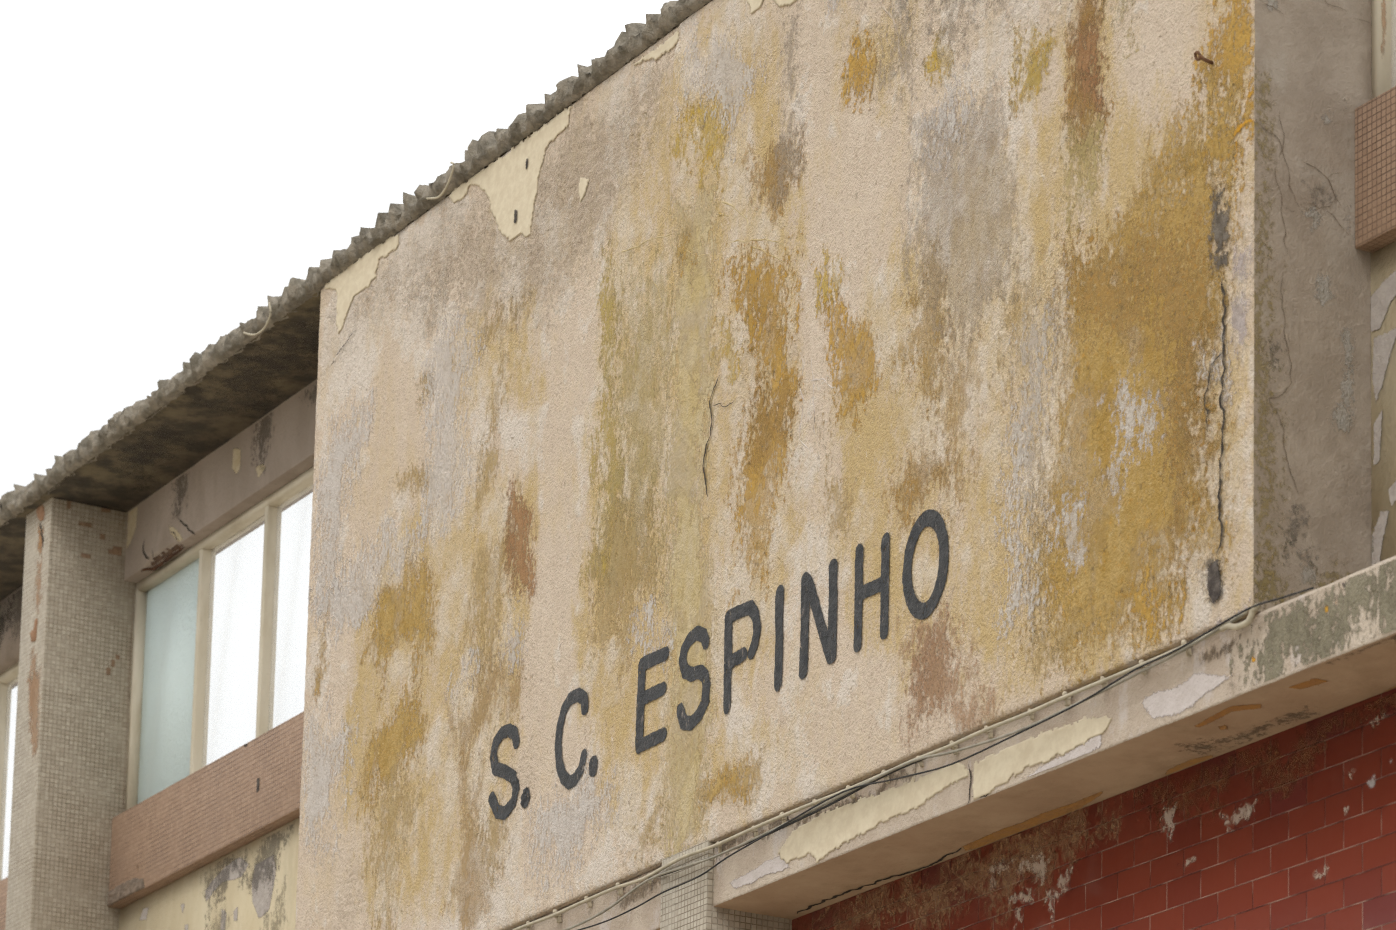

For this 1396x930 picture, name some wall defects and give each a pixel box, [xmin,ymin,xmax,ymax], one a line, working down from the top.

water stain [923,30,972,167]
spalling [0,0,711,756]
water stain [994,0,1255,695]
crack [1233,91,1348,494]
peeling [1371,271,1396,465]
water stain [579,53,977,906]
peeling [1372,481,1396,565]
peeling [205,854,276,930]
water stain [525,760,615,892]
water stain [819,808,1120,930]
peeling [1142,672,1229,719]
water stain [1149,692,1396,839]